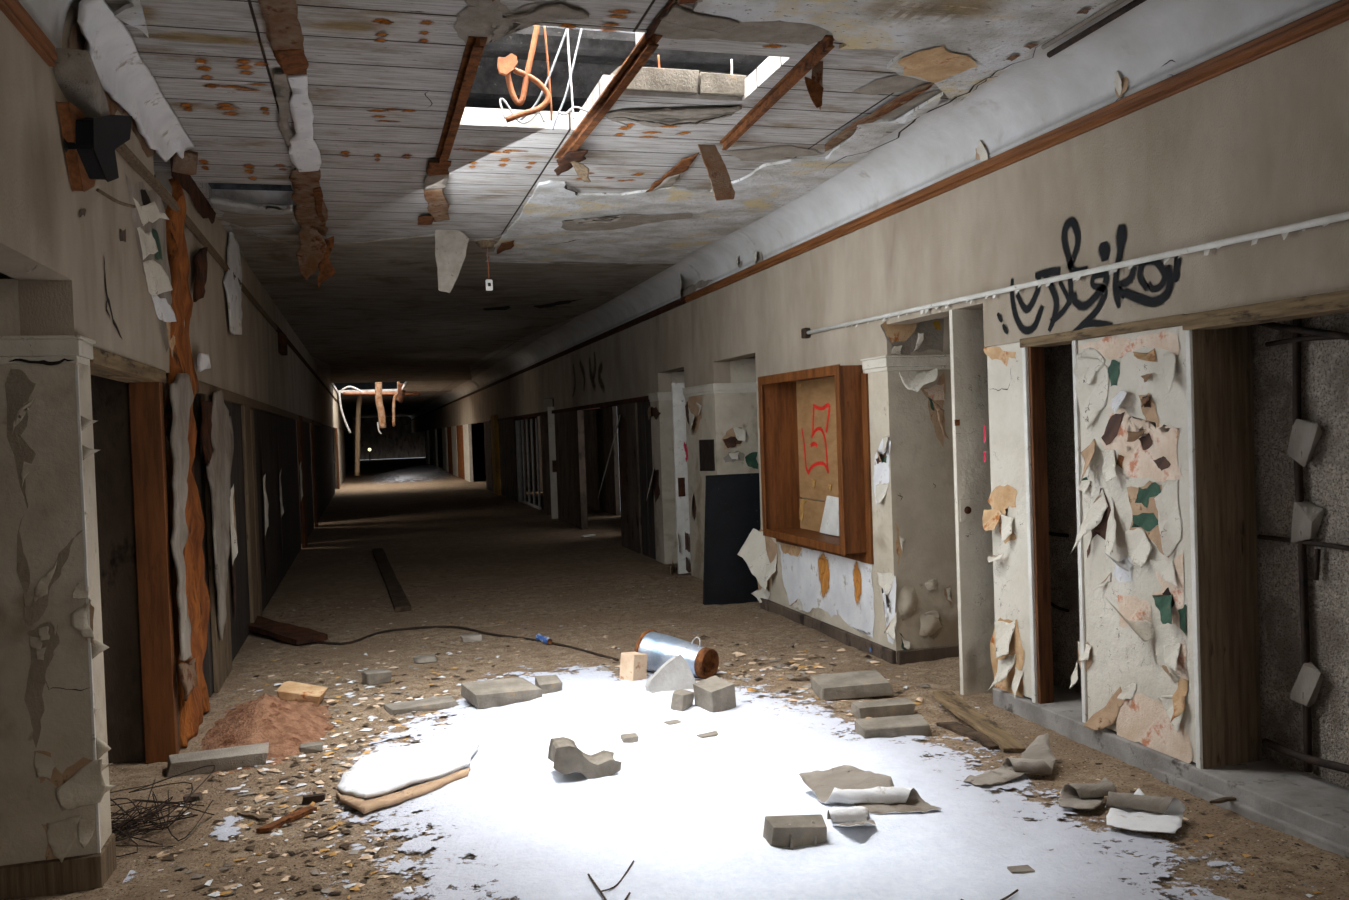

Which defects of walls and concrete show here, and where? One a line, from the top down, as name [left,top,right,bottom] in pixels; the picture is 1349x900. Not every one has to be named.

spalling [453,2,591,44]
spalling [655,1,829,45]
spalling [852,46,978,119]
spalling [607,106,742,127]
rust [453,148,536,169]
rust [313,187,325,223]
spalling [561,213,693,231]
peeling [880,305,948,355]
peeling [899,368,950,447]
peeling [982,484,1017,562]
peeling [1069,330,1193,763]
peeling [5,365,115,863]